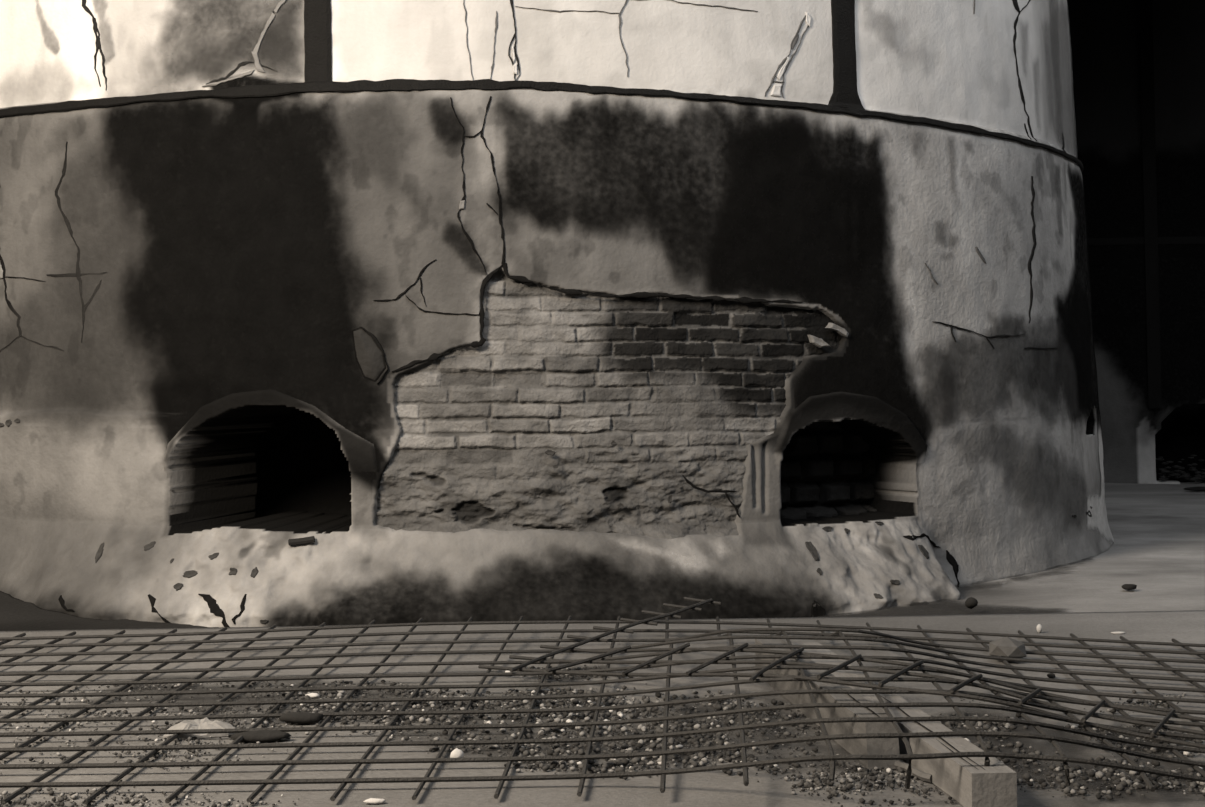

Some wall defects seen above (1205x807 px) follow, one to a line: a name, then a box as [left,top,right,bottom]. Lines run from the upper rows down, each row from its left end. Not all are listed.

crack [82,0,107,90]
water stain [164,0,302,80]
crack [765,12,811,98]
crack [1012,0,1066,152]
crack [0,142,107,352]
crack [373,0,796,372]
crack [933,176,1054,349]
flaking render [375,270,849,539]